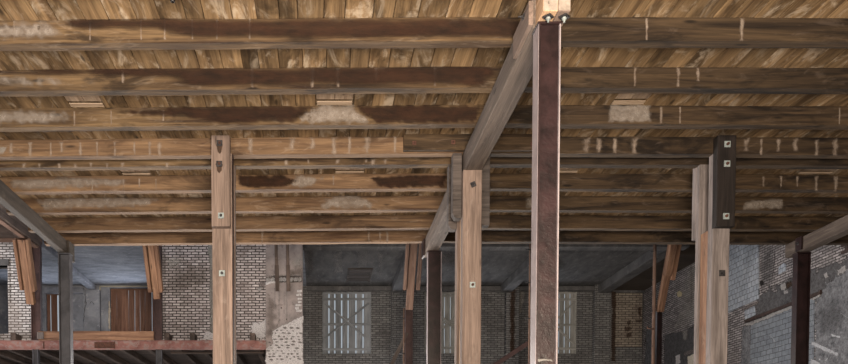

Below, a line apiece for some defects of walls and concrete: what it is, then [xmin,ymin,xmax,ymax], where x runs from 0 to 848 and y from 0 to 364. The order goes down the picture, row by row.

leakage [239,175,294,187]
leakage [373,176,446,188]
peeling [258,275,304,364]
spalling [745,306,792,326]